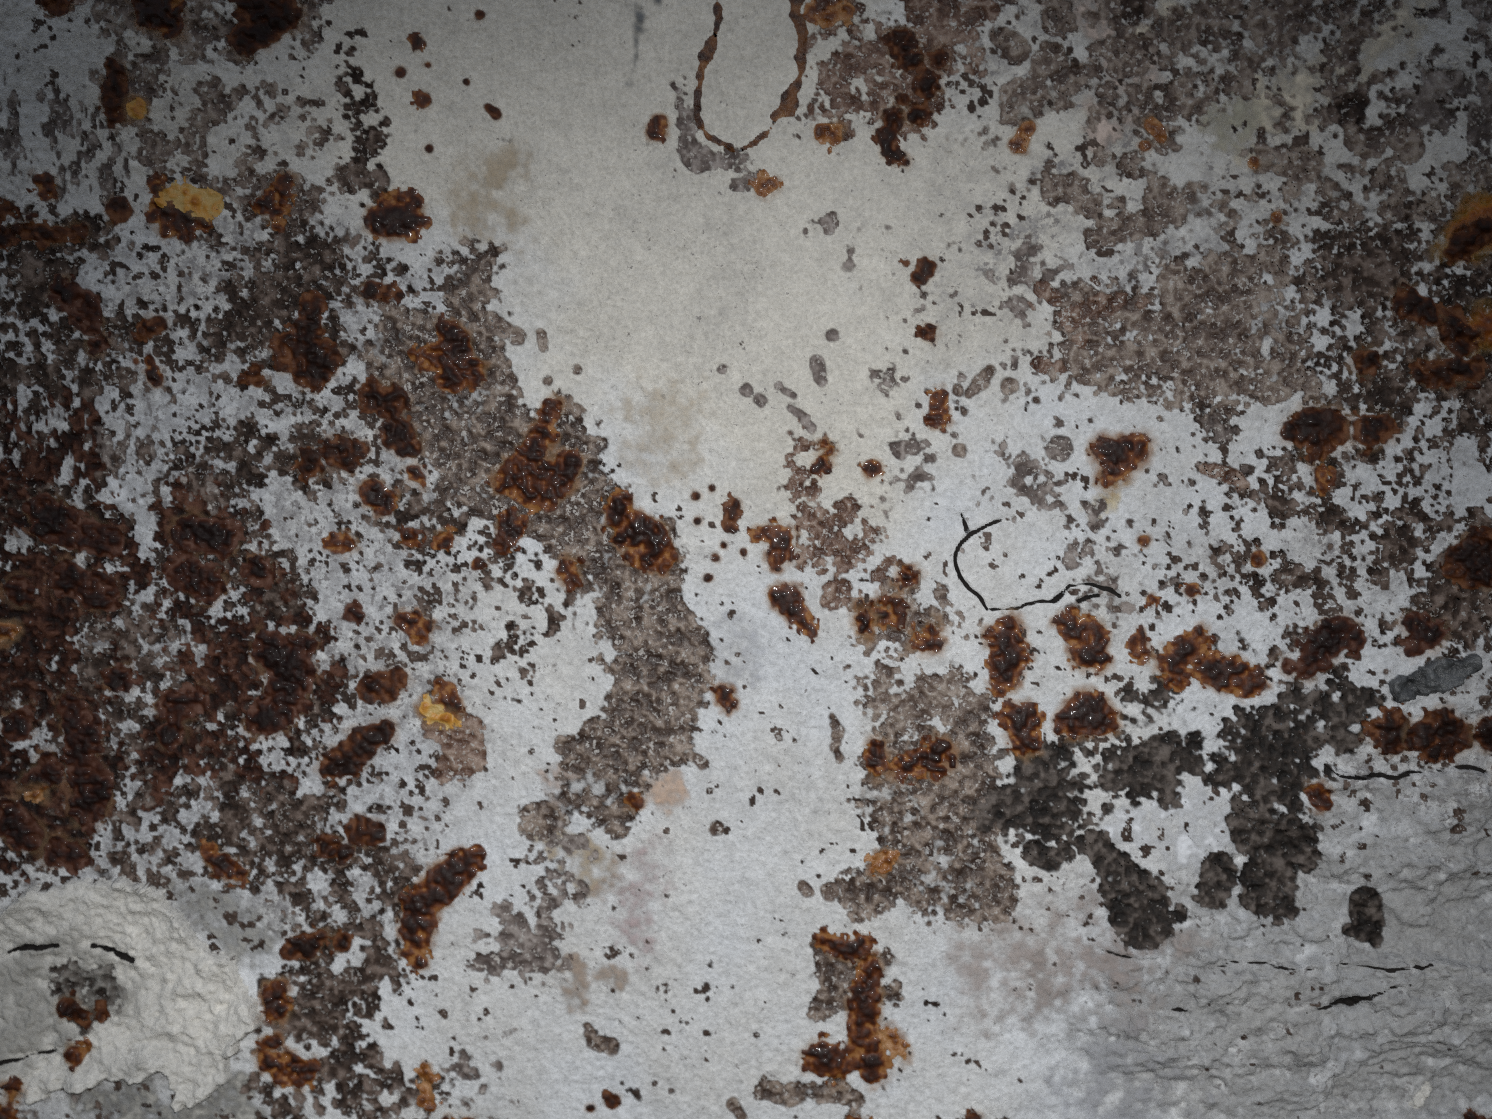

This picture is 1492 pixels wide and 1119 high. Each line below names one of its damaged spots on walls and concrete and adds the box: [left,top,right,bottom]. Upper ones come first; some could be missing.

corrosion [237,290,344,393]
corrosion [290,374,457,554]
corrosion [1088,433,1151,488]
corrosion [691,485,820,644]
crack [953,513,1121,611]
corrosion [317,665,466,789]
corrosion [982,594,1367,757]
corrosion [1358,703,1492,764]
corrosion [396,844,487,976]
crack [0,1048,57,1066]
corrosion [255,979,321,1090]
corrosion [802,925,910,1087]